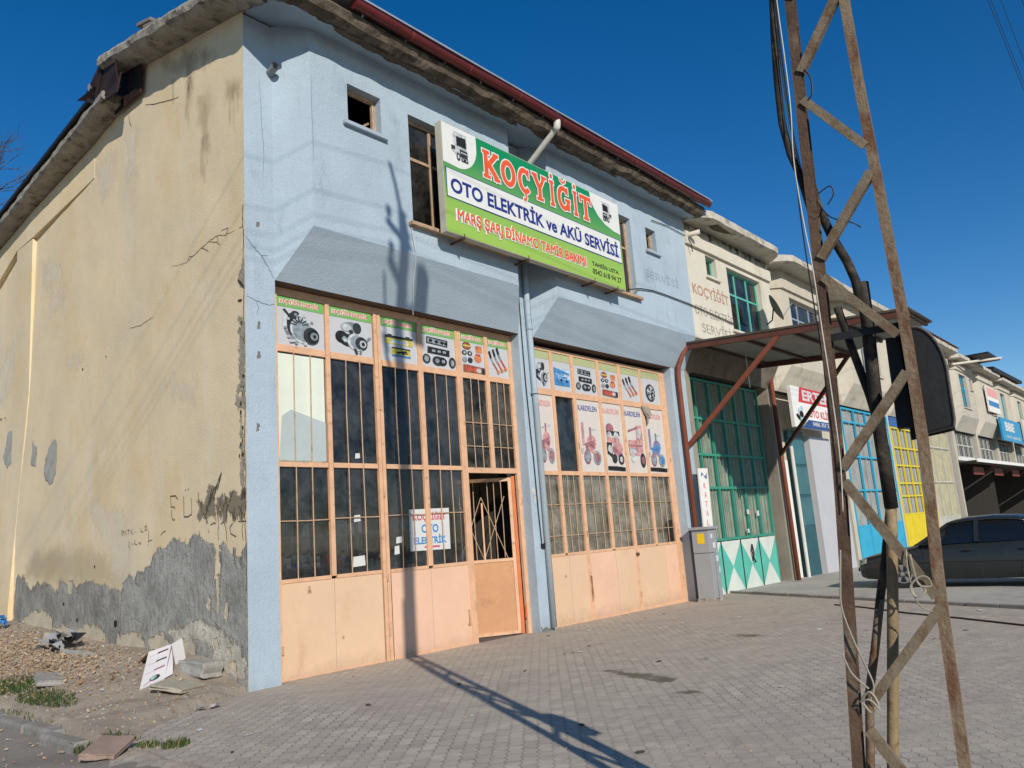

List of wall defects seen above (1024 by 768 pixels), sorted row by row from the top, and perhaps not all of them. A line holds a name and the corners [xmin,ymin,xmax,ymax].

crack [176,207,274,278]
crack [243,295,273,343]
peeling [3,431,12,468]
peeling [31,440,57,484]
crack [240,391,248,590]
peeling [0,533,248,722]